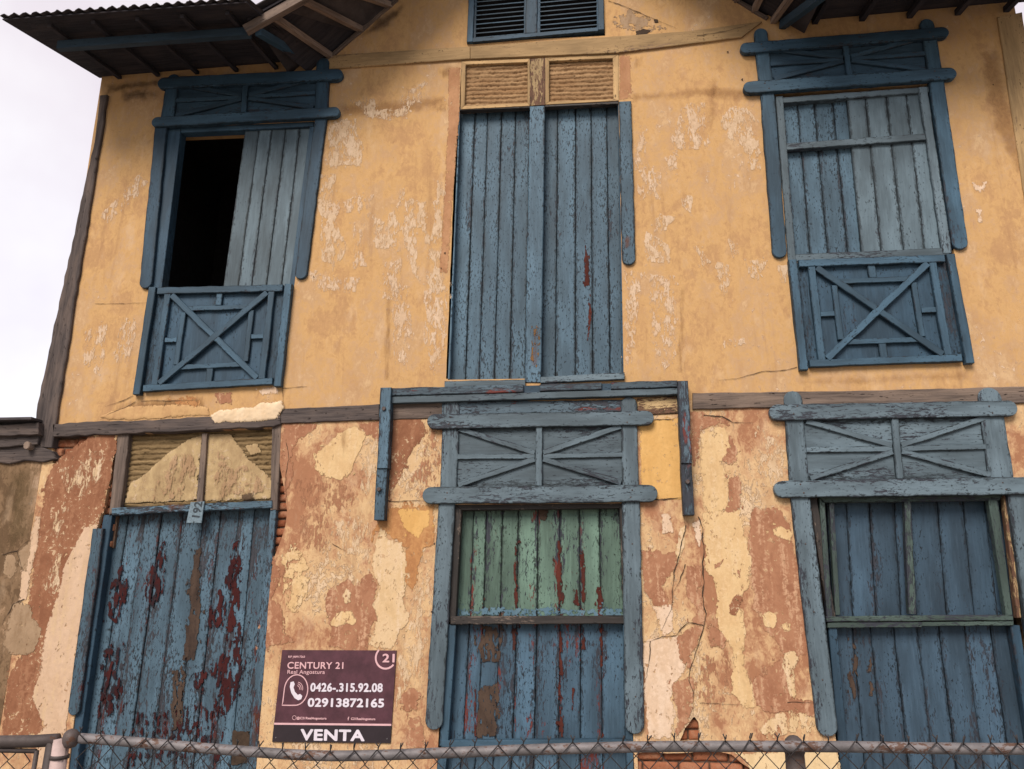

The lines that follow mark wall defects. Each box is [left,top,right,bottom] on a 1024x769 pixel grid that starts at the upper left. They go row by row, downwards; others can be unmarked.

flaking render [309,67,460,371]
peeling [621,213,679,370]
peeling [634,102,711,200]
peeling [721,106,761,171]
peeling [696,238,788,293]
flaking render [2,435,120,735]
peeling [97,419,441,766]
crack [643,498,734,719]
flaking render [637,411,815,769]
peeling [805,752,840,769]